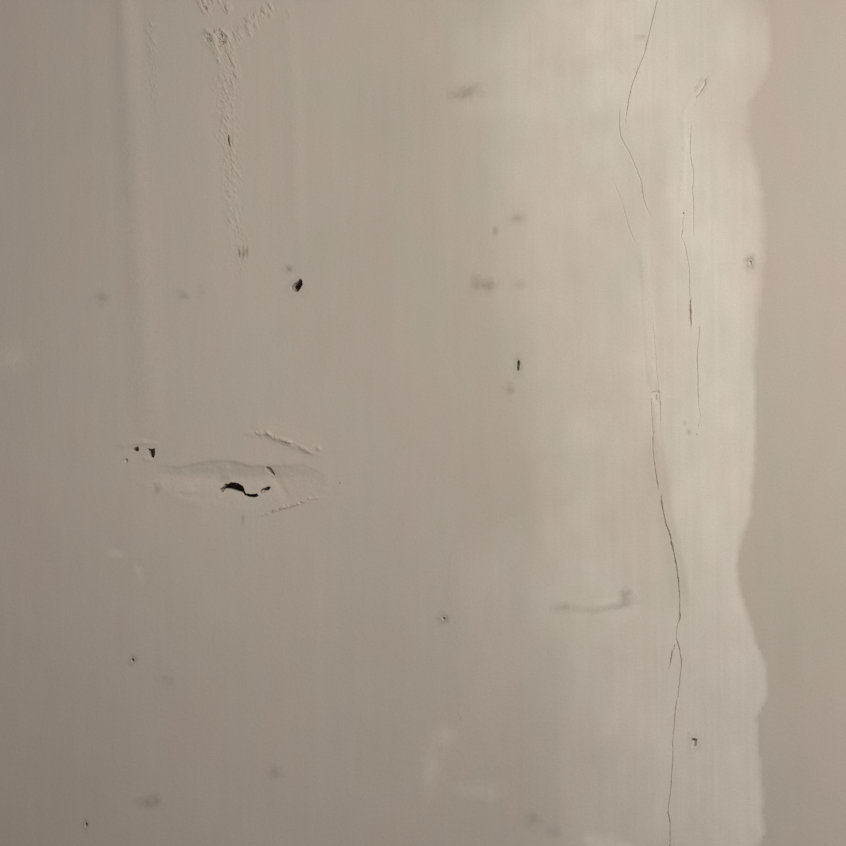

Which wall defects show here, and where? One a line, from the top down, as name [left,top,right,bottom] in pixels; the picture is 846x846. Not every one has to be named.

crack [613,0,683,846]
crack [678,72,711,434]